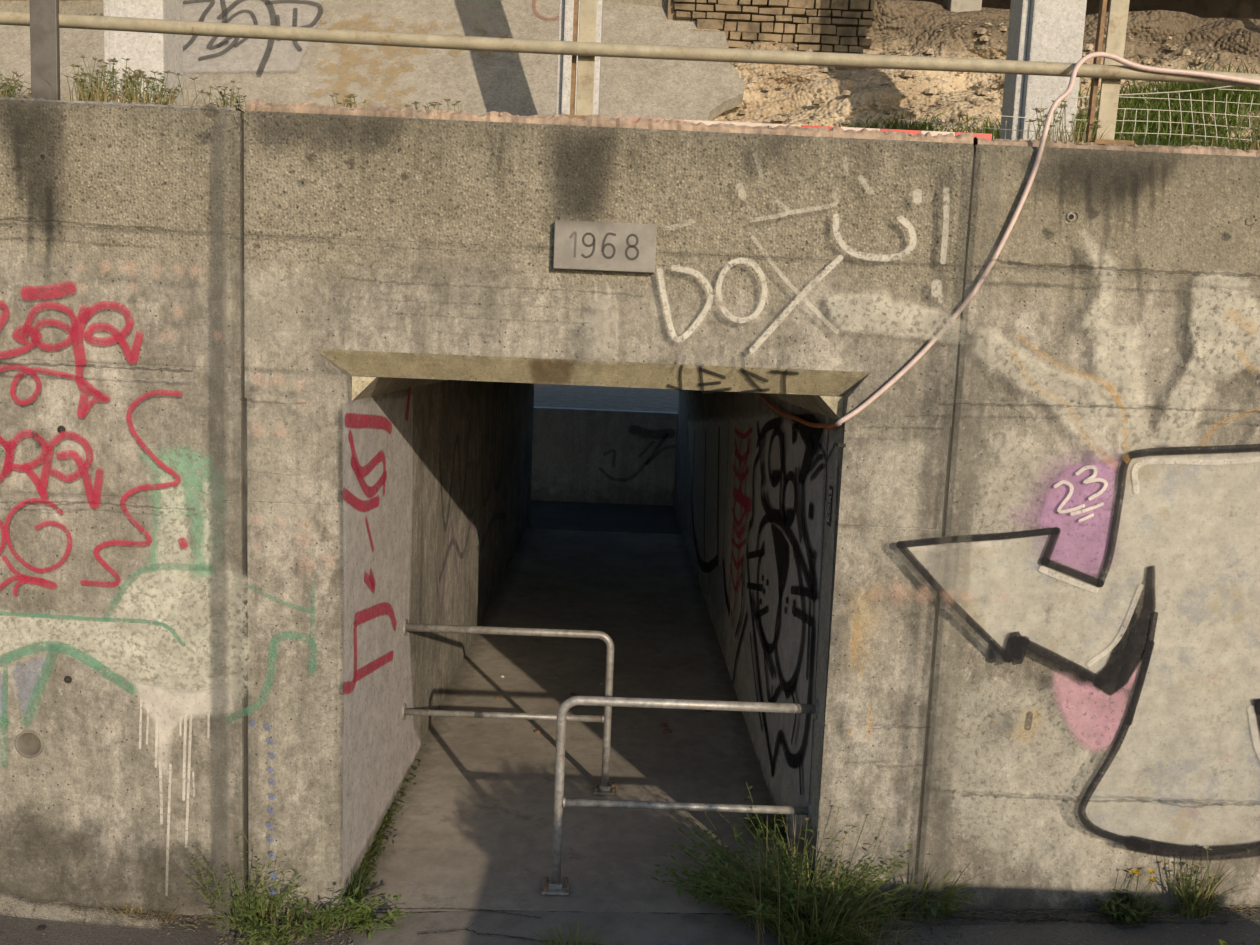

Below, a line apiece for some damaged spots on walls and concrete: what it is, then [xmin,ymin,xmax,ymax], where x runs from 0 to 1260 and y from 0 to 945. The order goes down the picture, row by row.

leakage [4,99,53,241]
leakage [1048,149,1176,224]
crack [373,908,606,945]